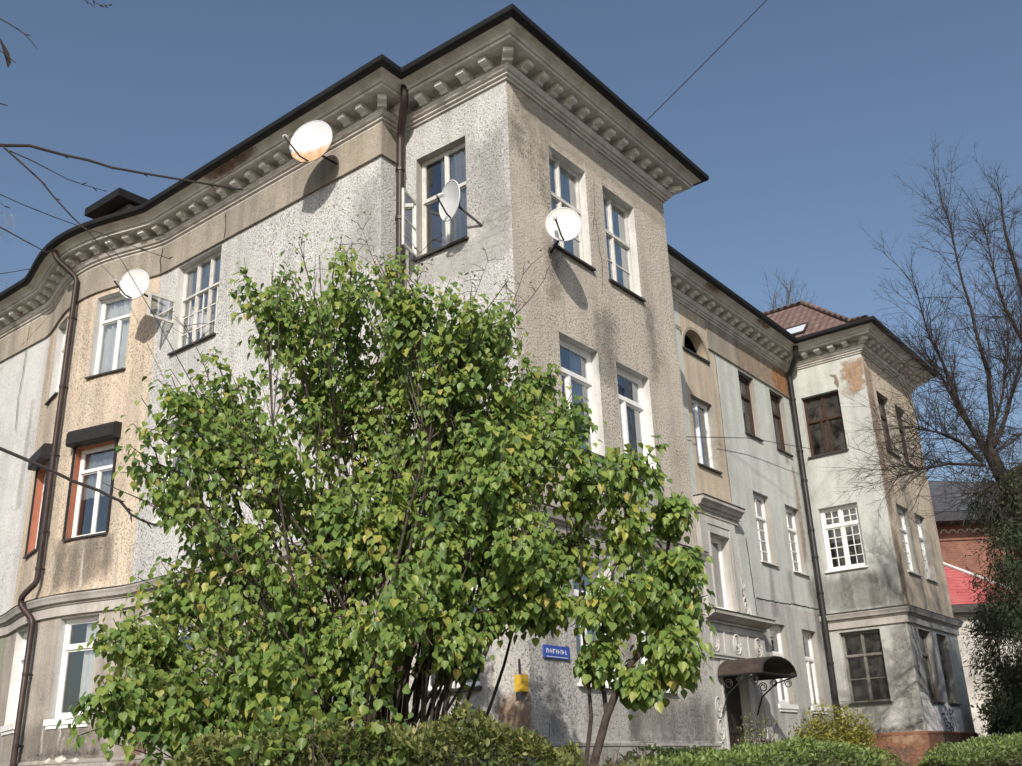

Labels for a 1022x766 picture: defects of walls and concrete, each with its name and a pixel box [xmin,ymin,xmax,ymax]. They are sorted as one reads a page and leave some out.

flaking render [830,358,892,514]
flaking render [894,534,907,593]